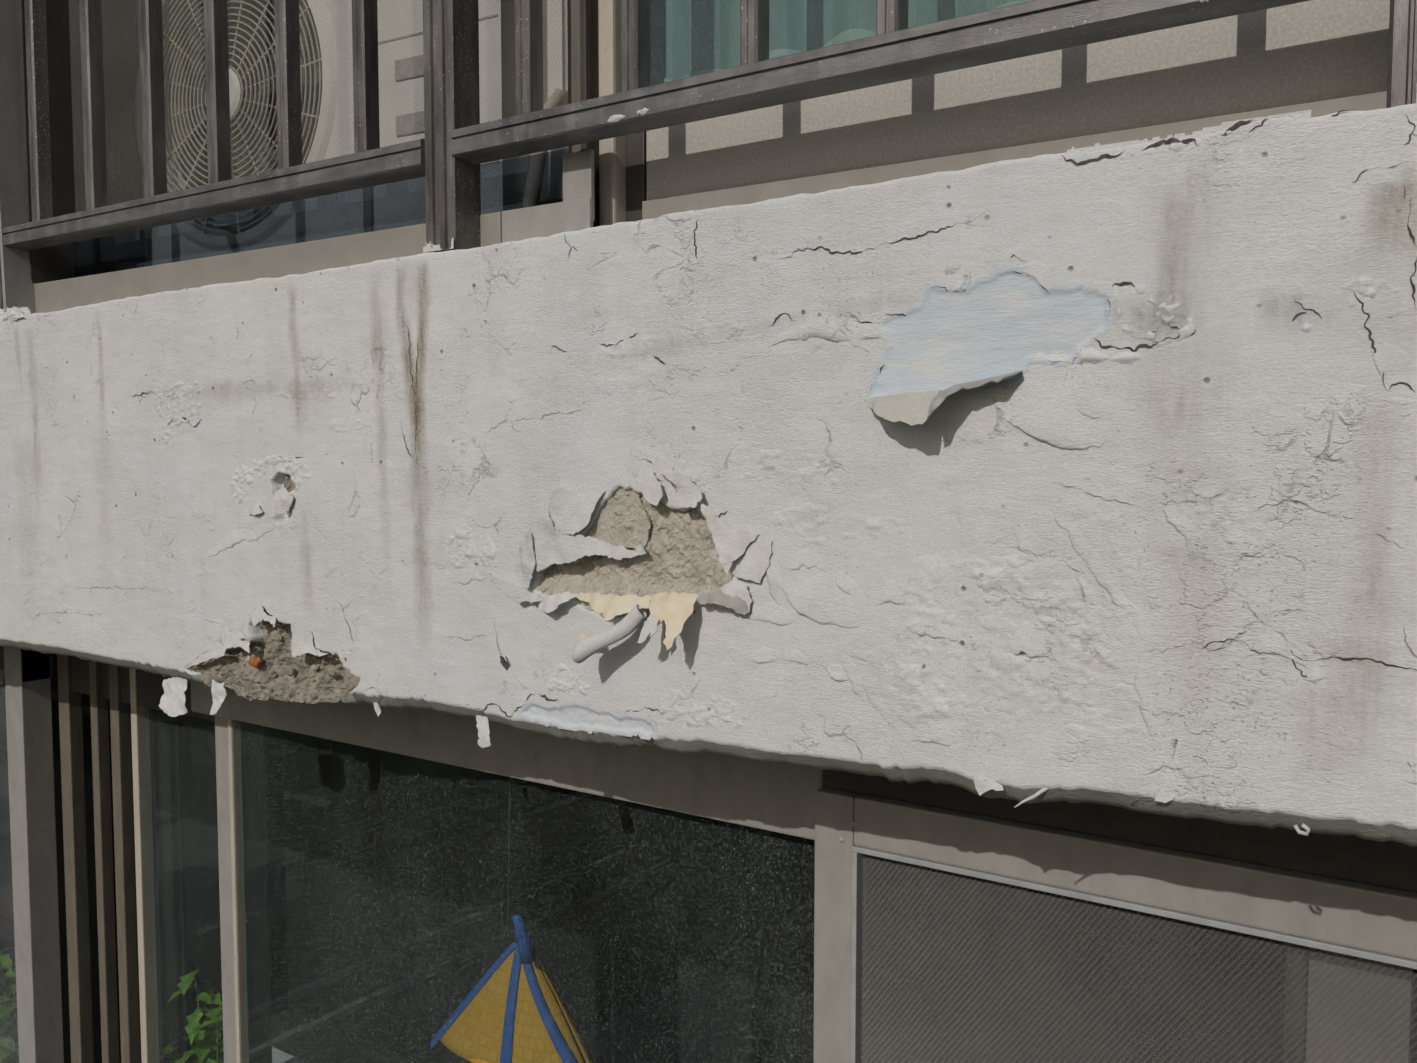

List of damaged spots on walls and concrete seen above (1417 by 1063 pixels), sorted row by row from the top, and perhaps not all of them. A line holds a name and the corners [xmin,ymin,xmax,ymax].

crack [764,213,984,264]
crack [1352,112,1417,305]
peeling [845,254,1197,426]
crack [1348,288,1414,391]
peeling [202,455,311,562]
spalling [445,450,773,748]
spalling [159,606,360,717]